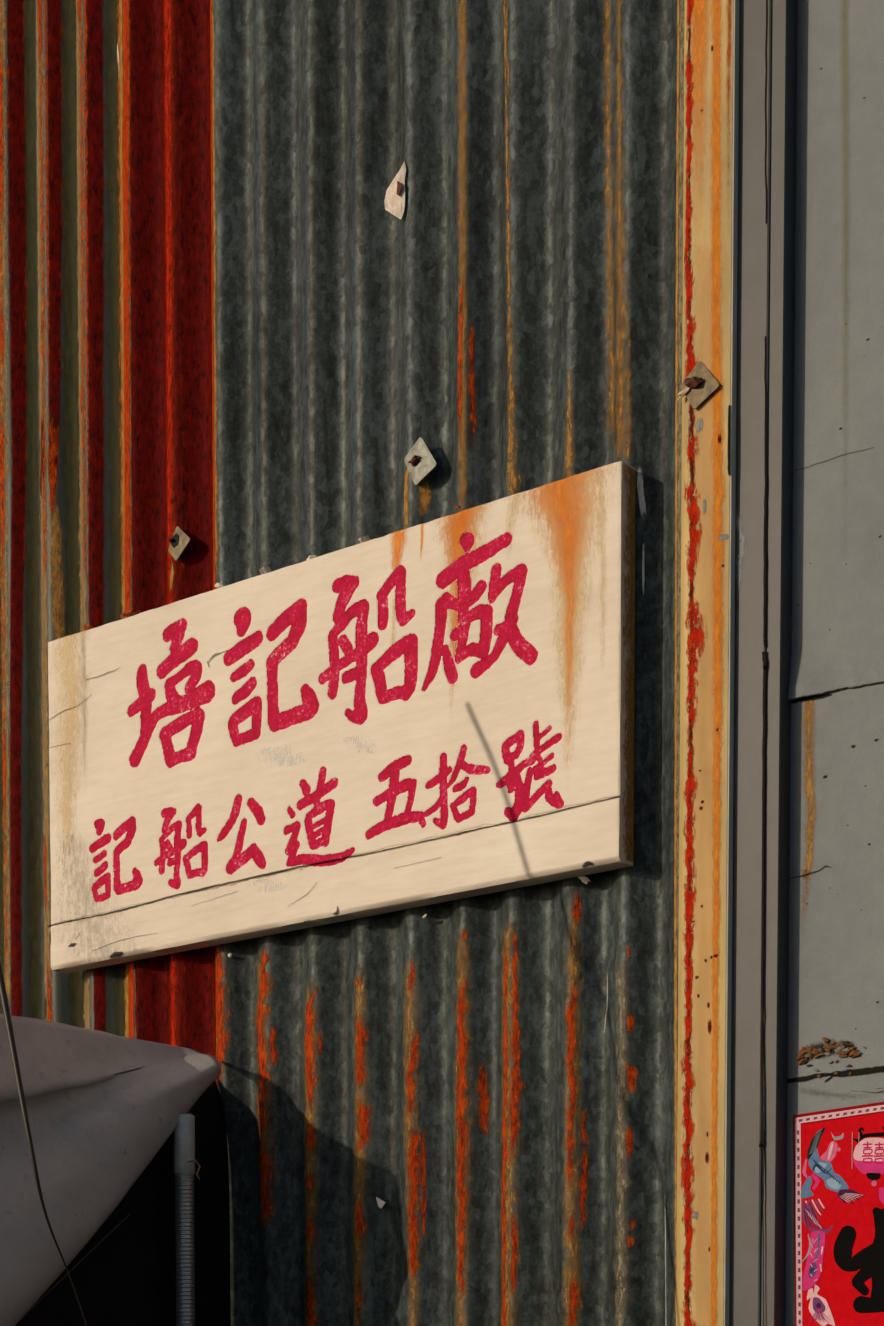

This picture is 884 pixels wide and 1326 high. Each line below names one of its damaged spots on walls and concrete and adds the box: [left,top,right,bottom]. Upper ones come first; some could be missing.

corrosion [0,0,218,1022]
corrosion [674,0,731,1326]
corrosion [84,967,106,1032]
corrosion [124,945,230,1087]
corrosion [256,949,278,1224]
corrosion [304,990,322,1326]
corrosion [354,978,371,1326]
corrosion [404,960,427,1326]
corrosion [455,929,526,1326]
corrosion [565,890,589,1326]
corrosion [615,946,637,1326]
spalling [797,1028,884,1092]